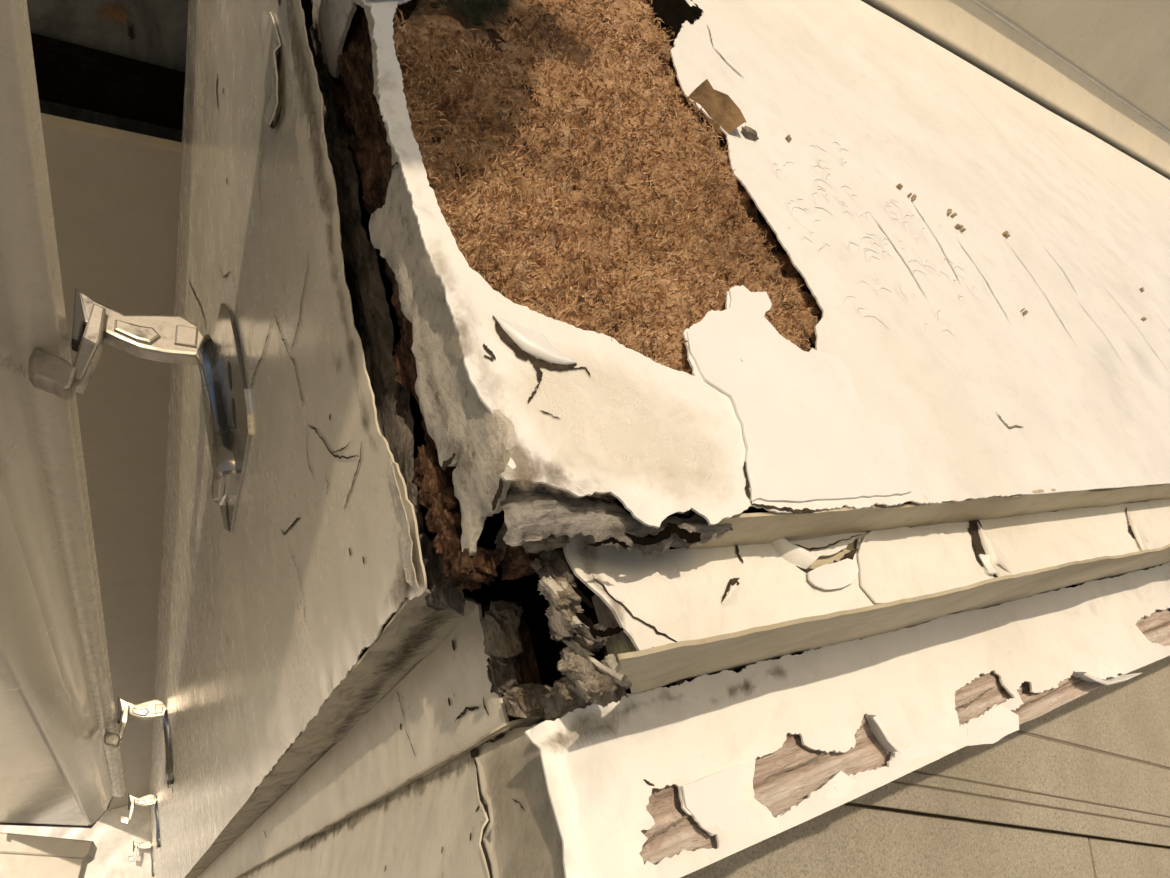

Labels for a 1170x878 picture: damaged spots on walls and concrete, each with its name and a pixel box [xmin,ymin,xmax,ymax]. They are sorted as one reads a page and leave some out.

peeling [393,0,912,502]
crack [249,268,362,508]
crack [483,316,591,420]
crack [441,453,456,470]
crack [492,477,503,511]
peeling [500,480,733,556]
peeling [770,527,953,604]
peeling [979,554,997,576]
peeling [1136,609,1170,646]
crack [455,697,525,878]
peeling [639,671,1141,864]